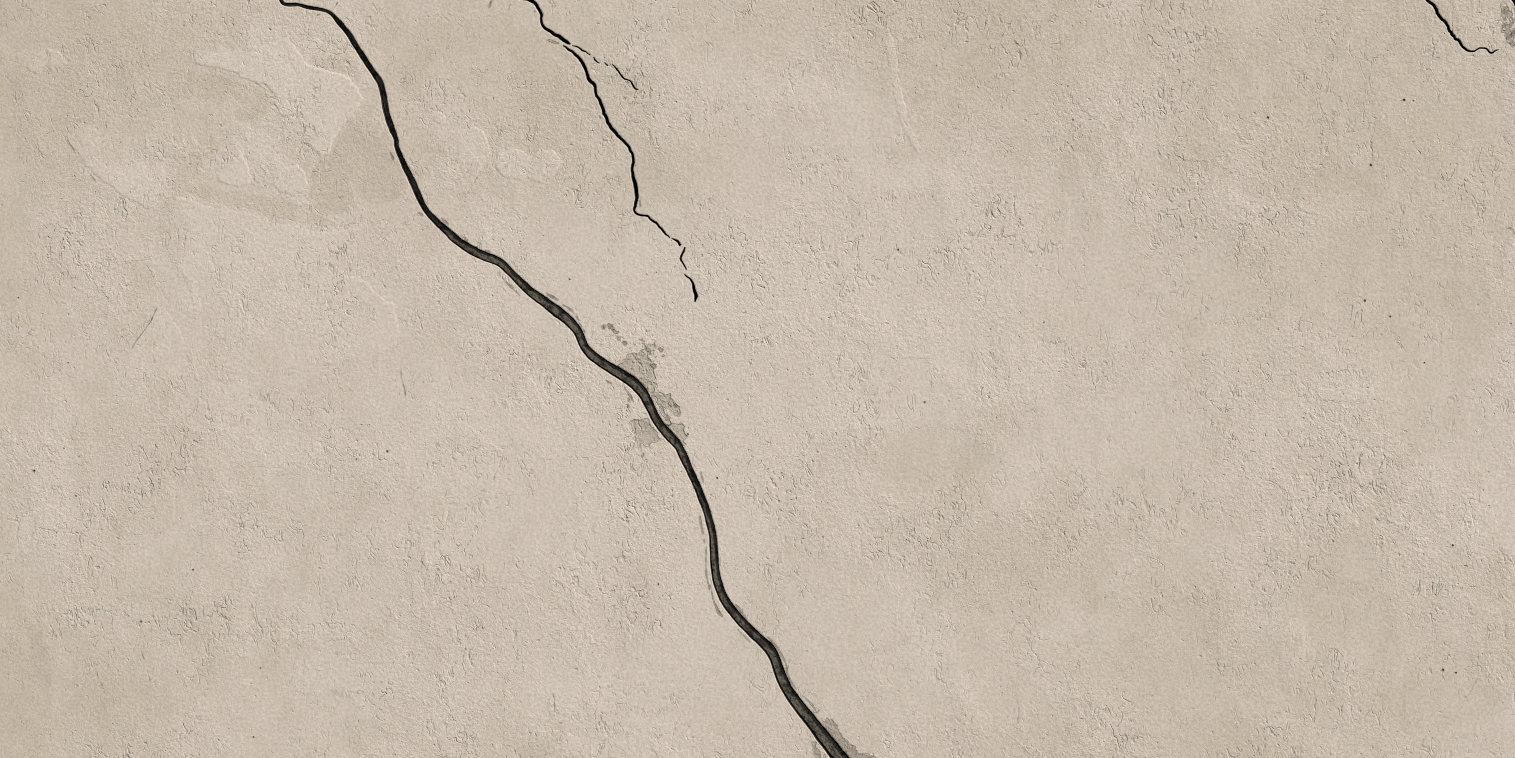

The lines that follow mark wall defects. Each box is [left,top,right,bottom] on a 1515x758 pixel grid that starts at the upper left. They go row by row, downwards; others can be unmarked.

crack [278,0,850,758]
crack [1424,0,1499,55]